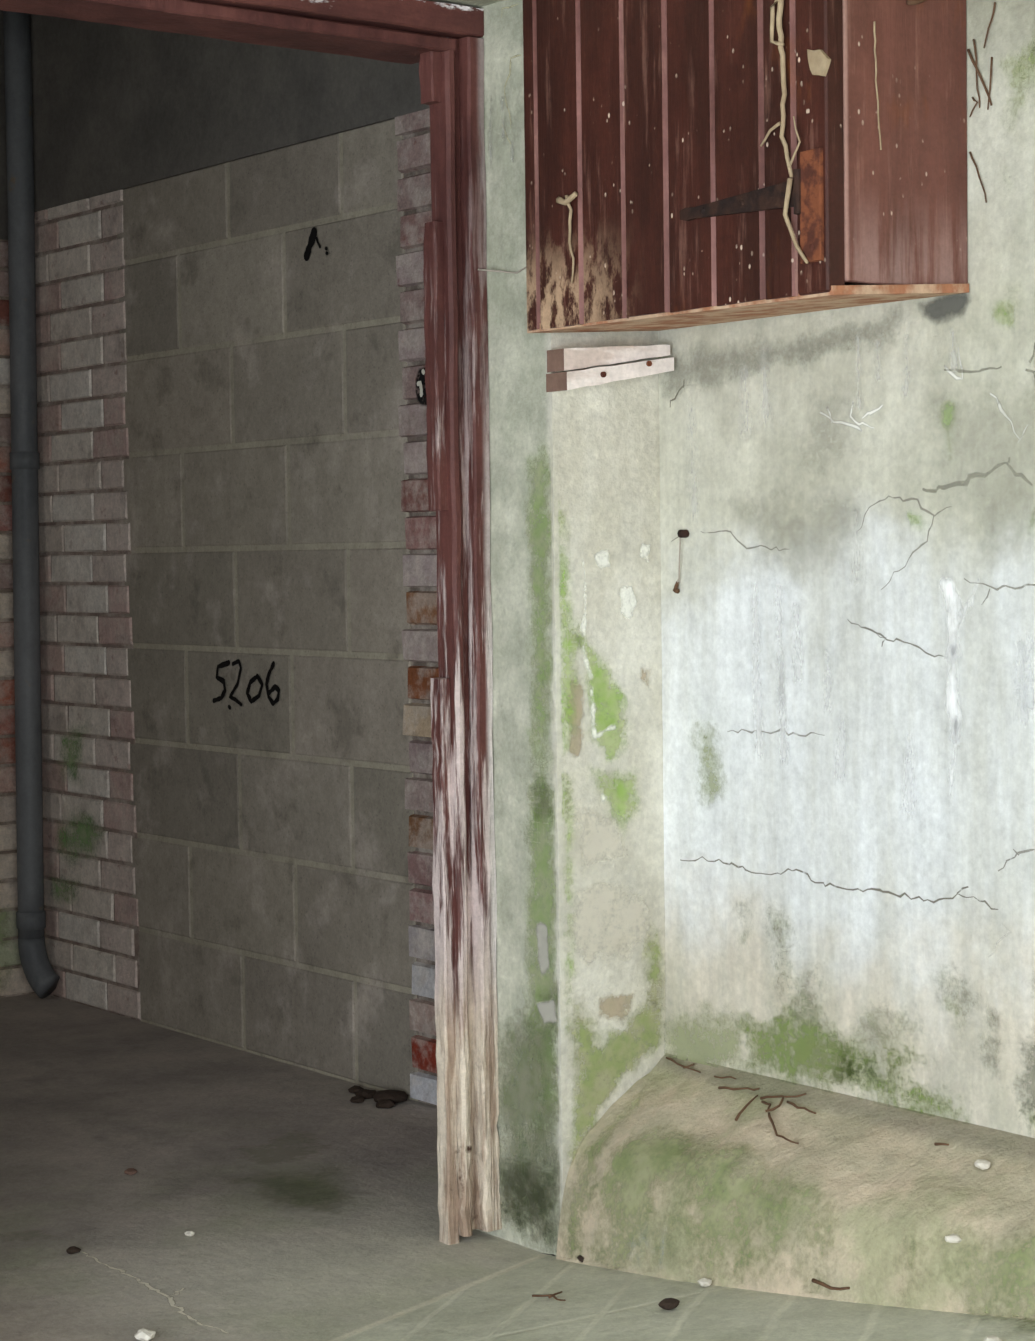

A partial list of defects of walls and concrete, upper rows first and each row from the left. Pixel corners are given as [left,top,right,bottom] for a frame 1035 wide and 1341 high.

crack [860,457,1032,590]
crack [964,578,1035,605]
crack [847,619,948,658]
crack [998,849,1033,871]
crack [681,857,1011,957]
damp [1022,1045,1035,1106]